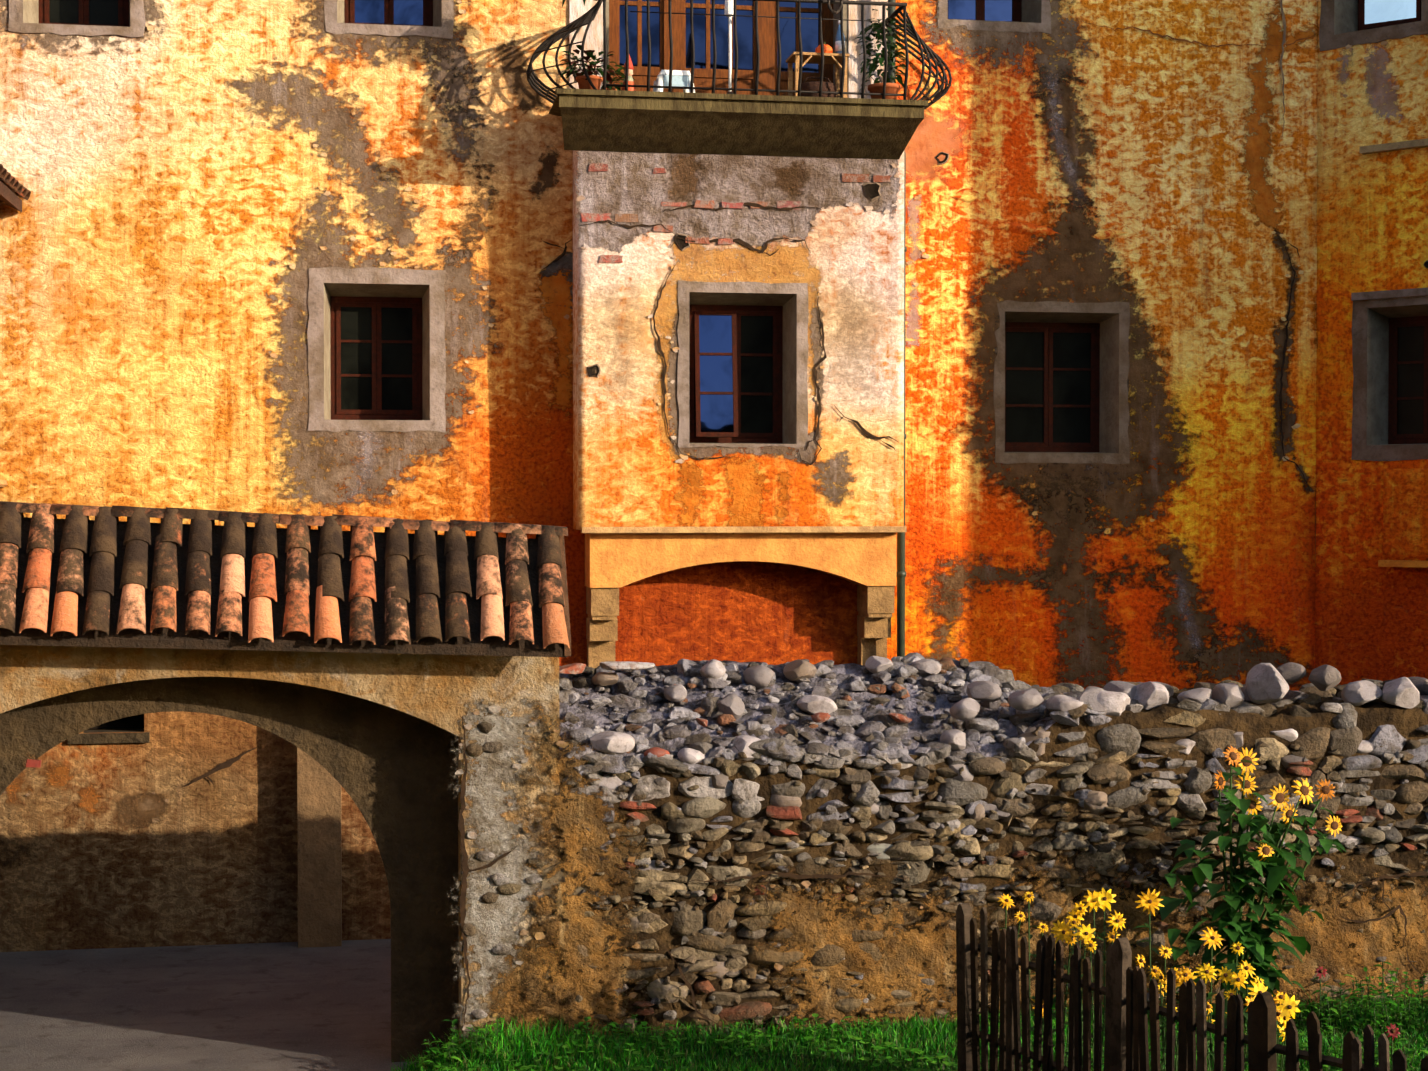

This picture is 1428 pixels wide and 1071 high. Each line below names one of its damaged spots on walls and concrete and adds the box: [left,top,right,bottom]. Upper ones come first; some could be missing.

crack [1083,0,1318,137]
crack [541,202,820,460]
spalling [539,150,930,464]
crack [798,288,898,465]
crack [1274,228,1310,491]
peeling [449,698,661,1043]